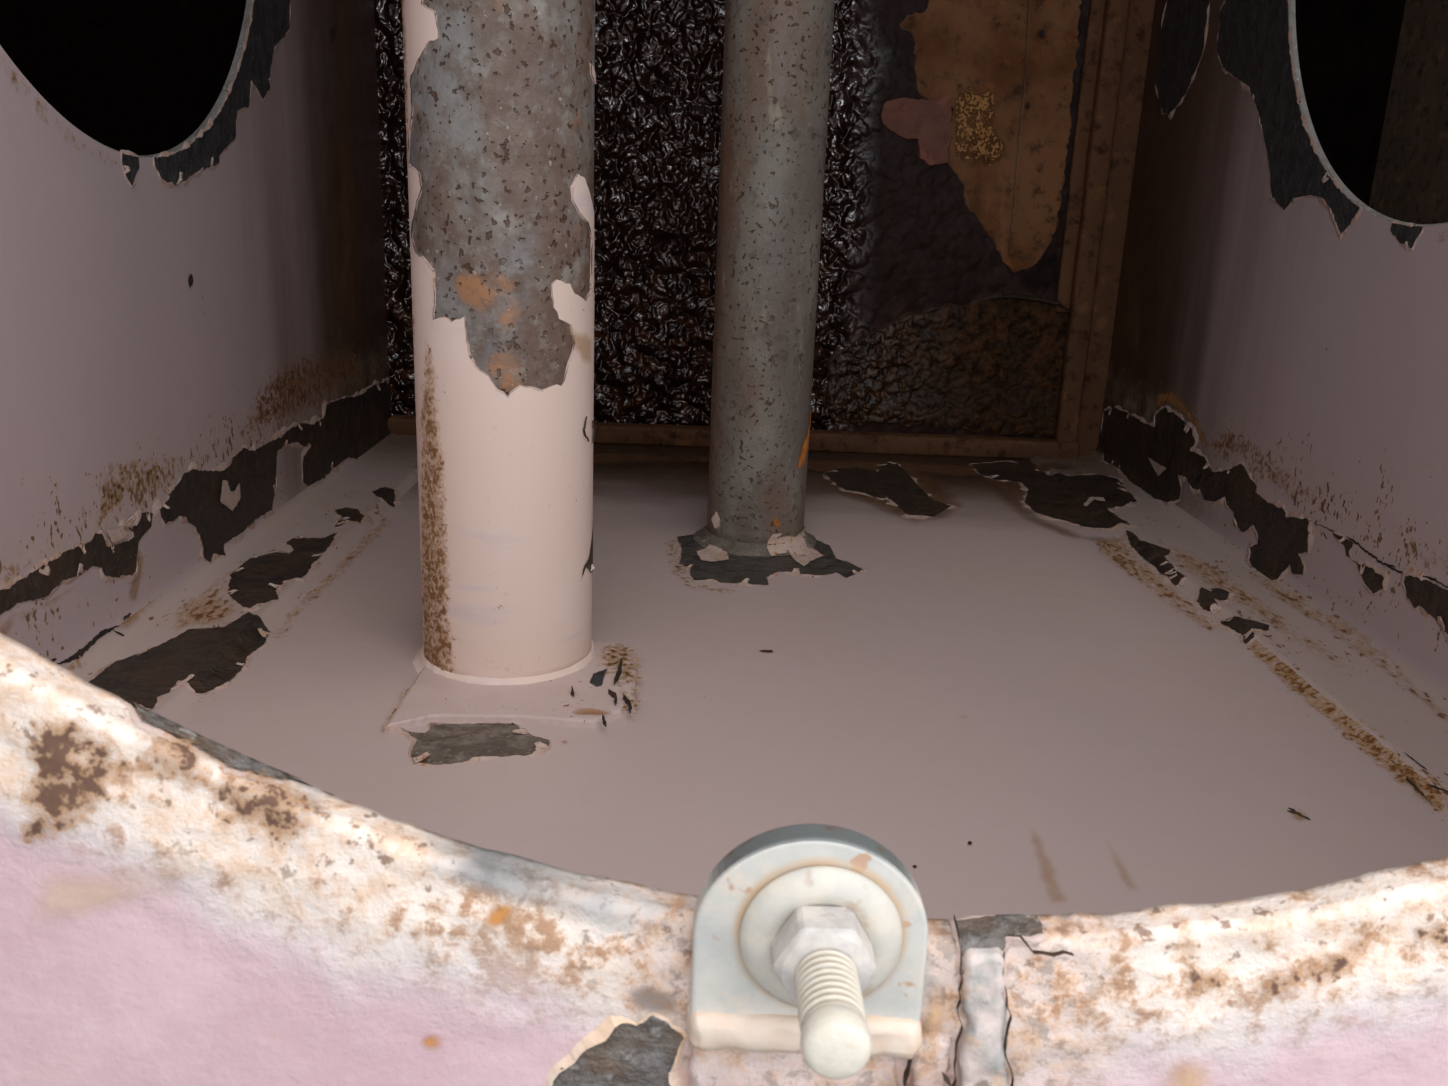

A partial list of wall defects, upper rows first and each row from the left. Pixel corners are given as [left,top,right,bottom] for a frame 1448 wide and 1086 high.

peeling [1155,0,1362,241]
peeling [0,377,404,796]
rust [420,346,456,673]
peeling [968,405,1314,645]
rust [20,718,314,844]
peeling [393,722,552,766]
rust [1248,642,1446,810]
peeling [546,1011,688,1086]
crack [903,915,963,1086]
crack [1003,935,1074,1086]
rust [1260,934,1376,1003]
rust [1417,922,1448,951]